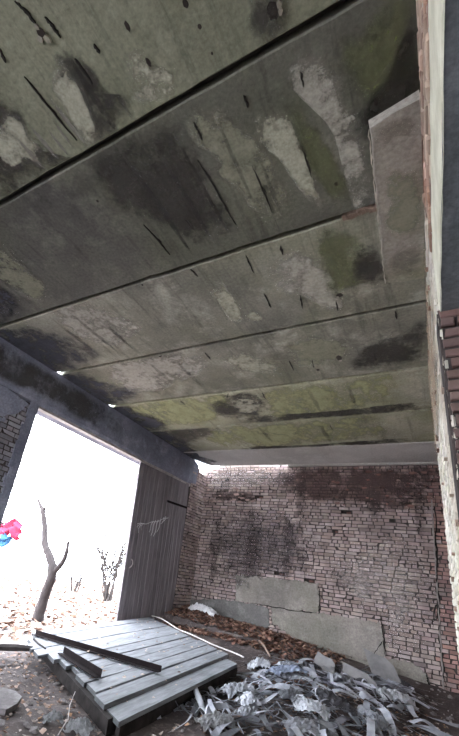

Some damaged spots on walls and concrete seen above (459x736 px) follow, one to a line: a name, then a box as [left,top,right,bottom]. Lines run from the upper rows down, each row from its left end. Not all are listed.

crack [24,76,77,141]
leakage [0,57,129,193]
leakage [293,32,418,190]
leakage [96,132,231,237]
crack [198,160,236,224]
crack [252,166,273,213]
crack [144,225,170,255]
leakage [354,251,384,281]
leakage [354,324,425,369]
leakage [213,394,417,422]
crack [426,490,447,689]